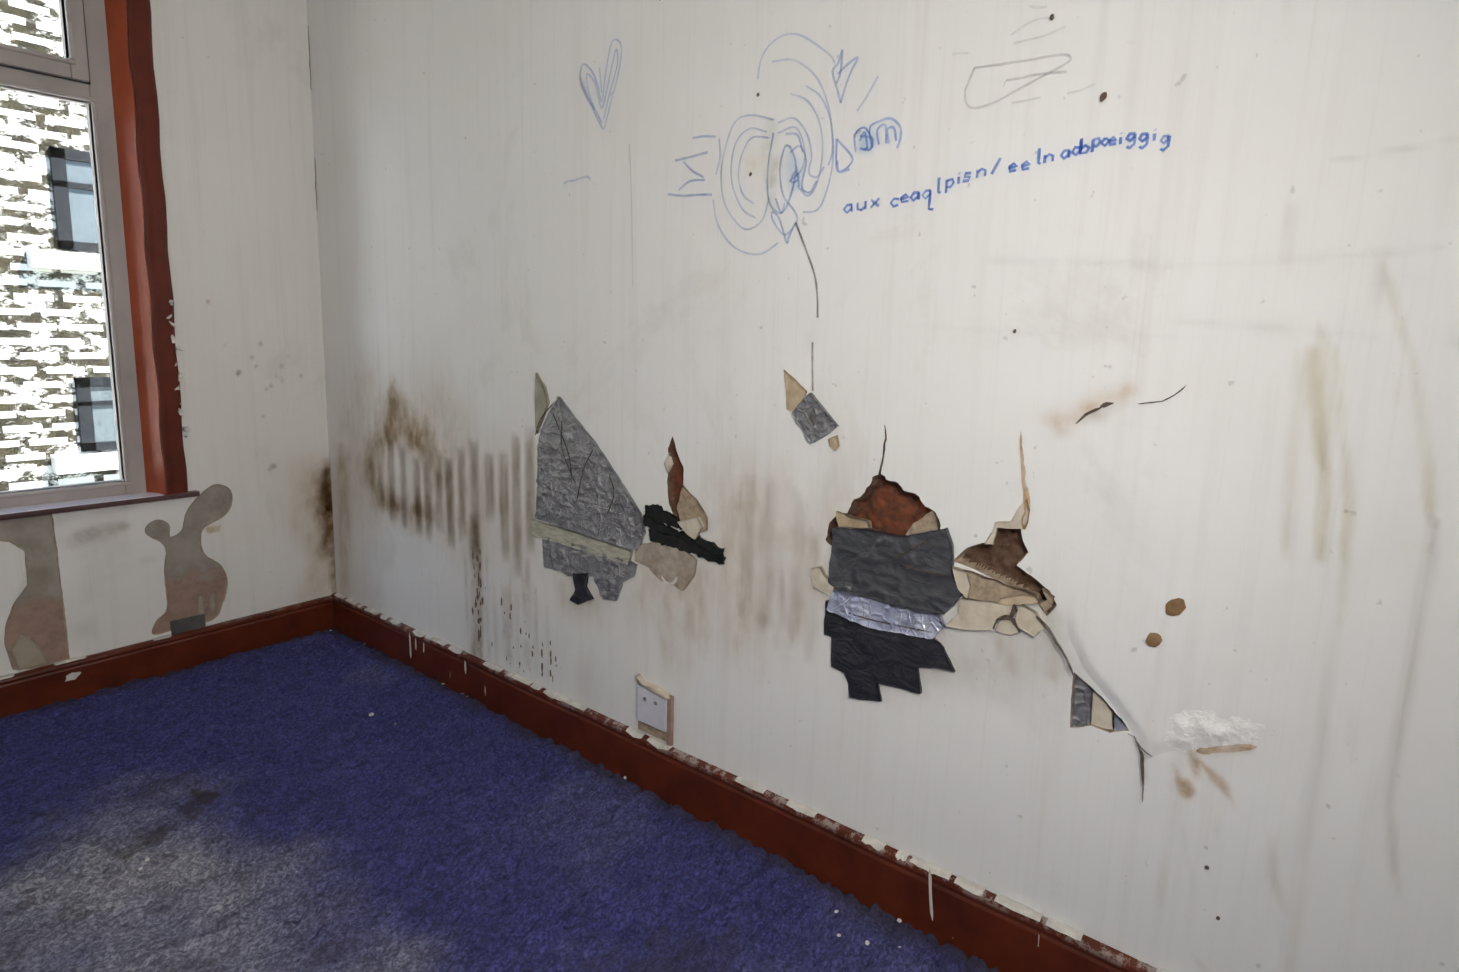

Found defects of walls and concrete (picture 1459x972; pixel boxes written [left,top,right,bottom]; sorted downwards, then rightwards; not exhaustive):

spalling [664,436,708,533]
spalling [826,474,941,546]
peeling [0,514,86,680]
peeling [145,484,233,641]
peeling [635,542,698,591]
spalling [945,499,1057,637]
crack [996,604,1074,676]
spalling [1070,672,1129,733]
crack [1127,733,1151,802]